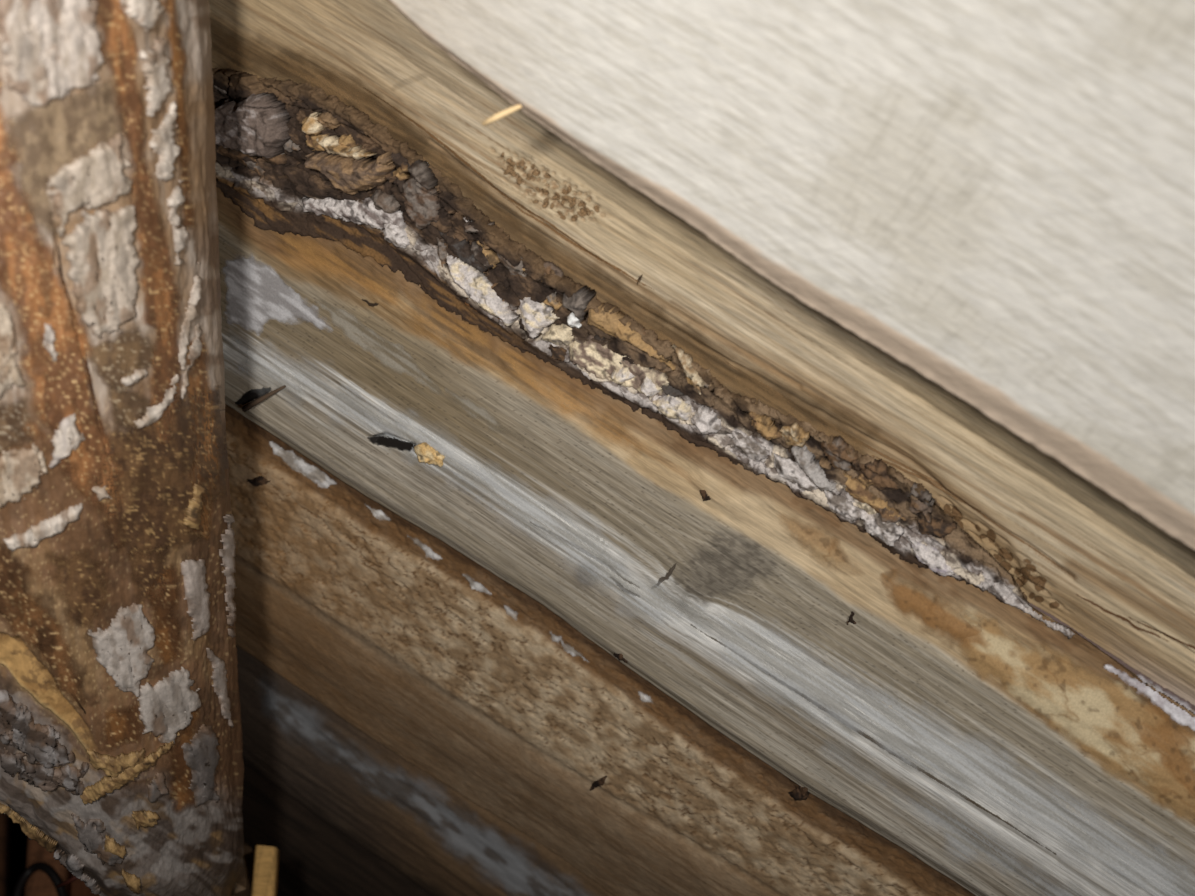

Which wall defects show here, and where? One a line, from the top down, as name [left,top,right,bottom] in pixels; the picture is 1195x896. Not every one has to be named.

peeling [214,85,527,289]
peeling [543,285,713,398]
damp [270,441,336,488]
peeling [749,411,957,538]
damp [368,507,390,521]
damp [414,539,442,559]
damp [463,574,492,594]
damp [551,633,585,660]
damp [1105,664,1195,730]
damp [268,693,584,896]